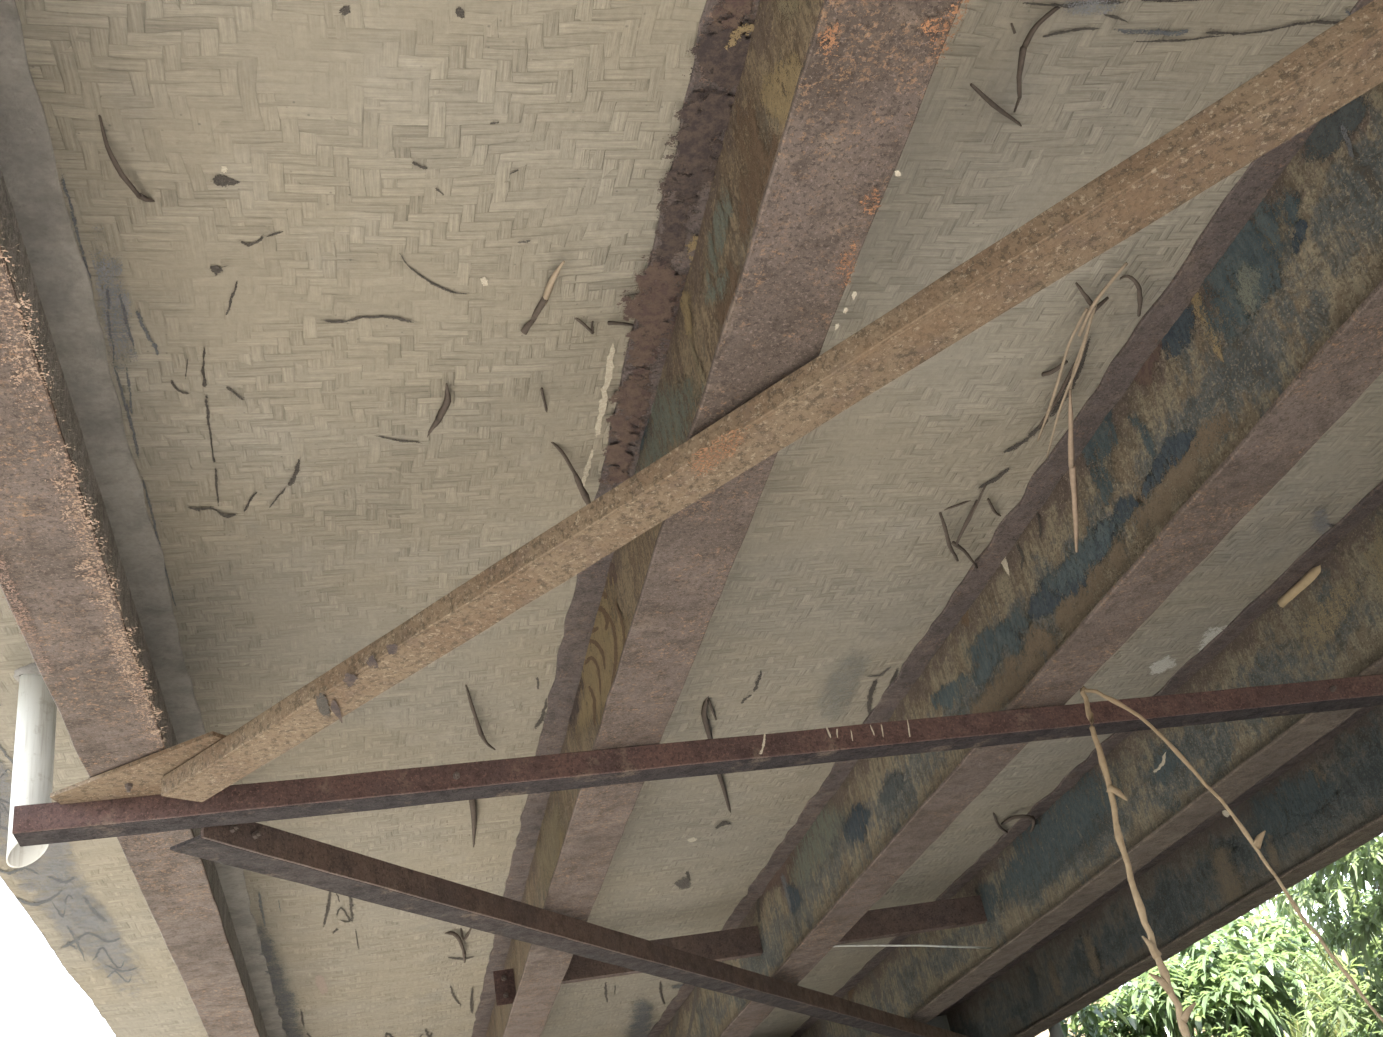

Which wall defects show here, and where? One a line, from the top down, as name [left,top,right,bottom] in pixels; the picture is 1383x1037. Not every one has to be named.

peeling [724,23,754,50]
corrosion [817,20,842,56]
corrosion [917,0,971,69]
damp [1299,94,1374,167]
damp [1156,184,1308,362]
peeling [582,343,615,486]
damp [930,406,1196,711]
damp [1198,625,1228,651]
crack [0,746,13,831]
crack [0,867,139,983]